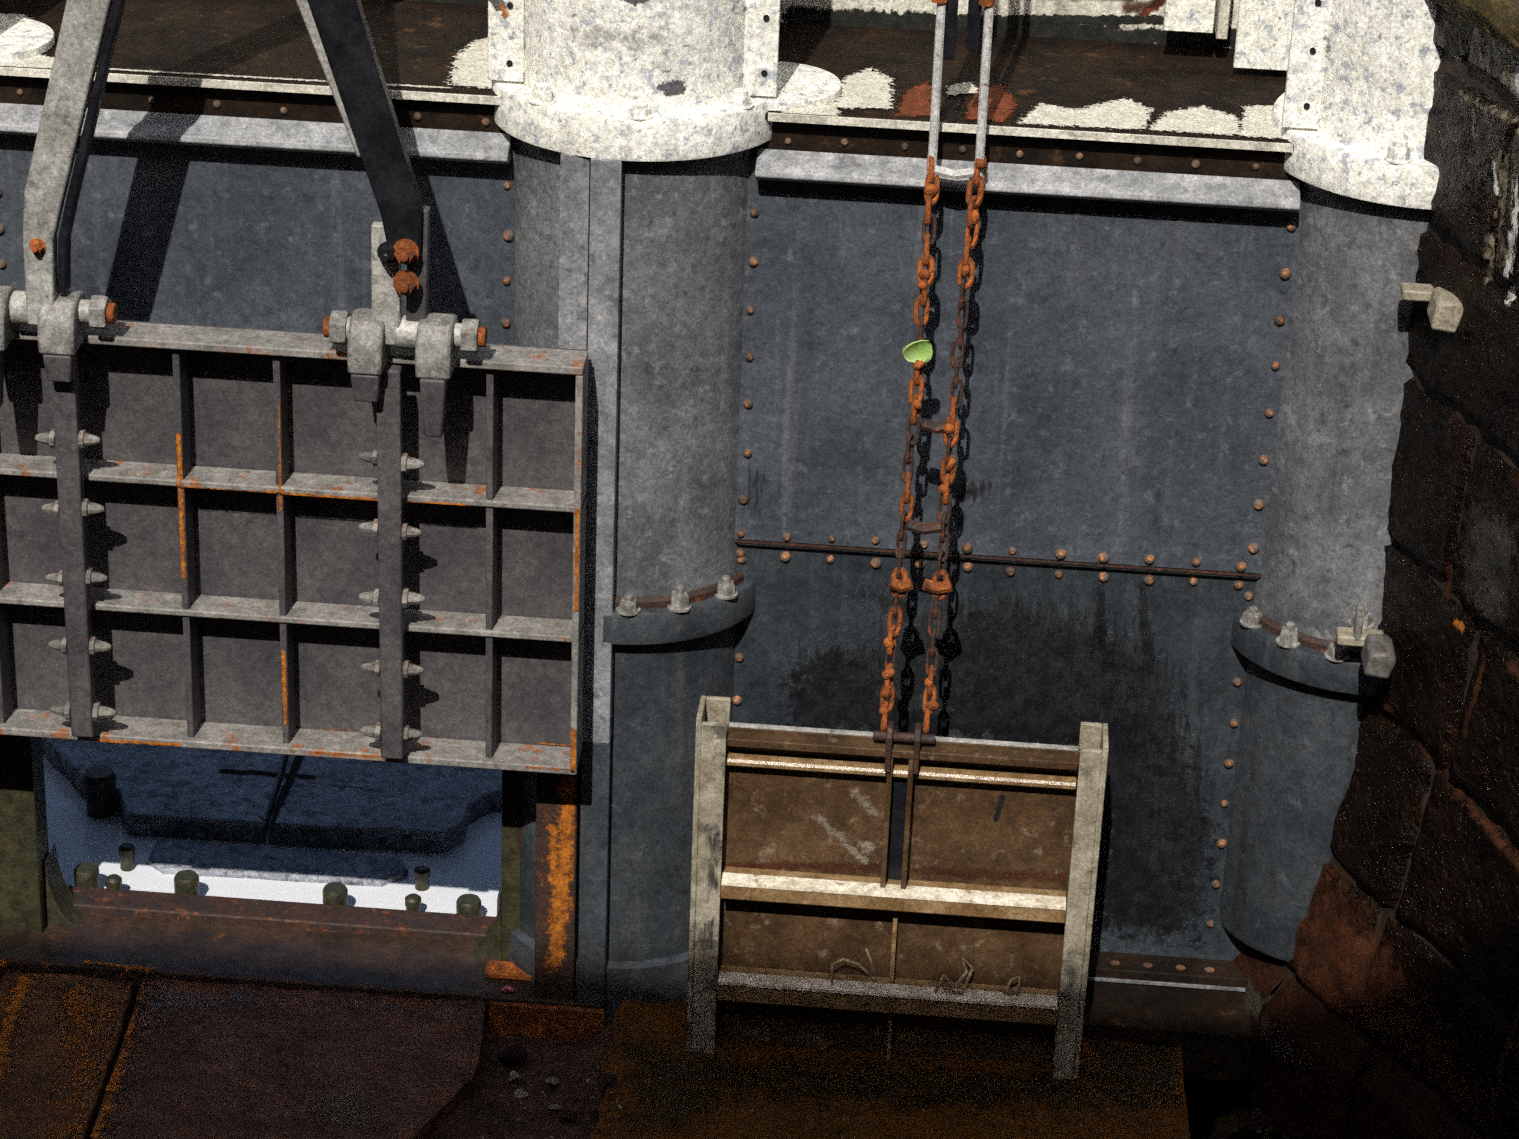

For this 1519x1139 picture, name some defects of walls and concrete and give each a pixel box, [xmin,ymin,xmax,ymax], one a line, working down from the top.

damp [1459,91,1519,135]
damp [1484,151,1519,306]
corrosion [176,386,378,579]
corrosion [96,738,180,746]
corrosion [525,729,576,971]
damp [779,582,1221,949]
corrosion [0,958,33,1079]
corrosion [80,960,155,1139]